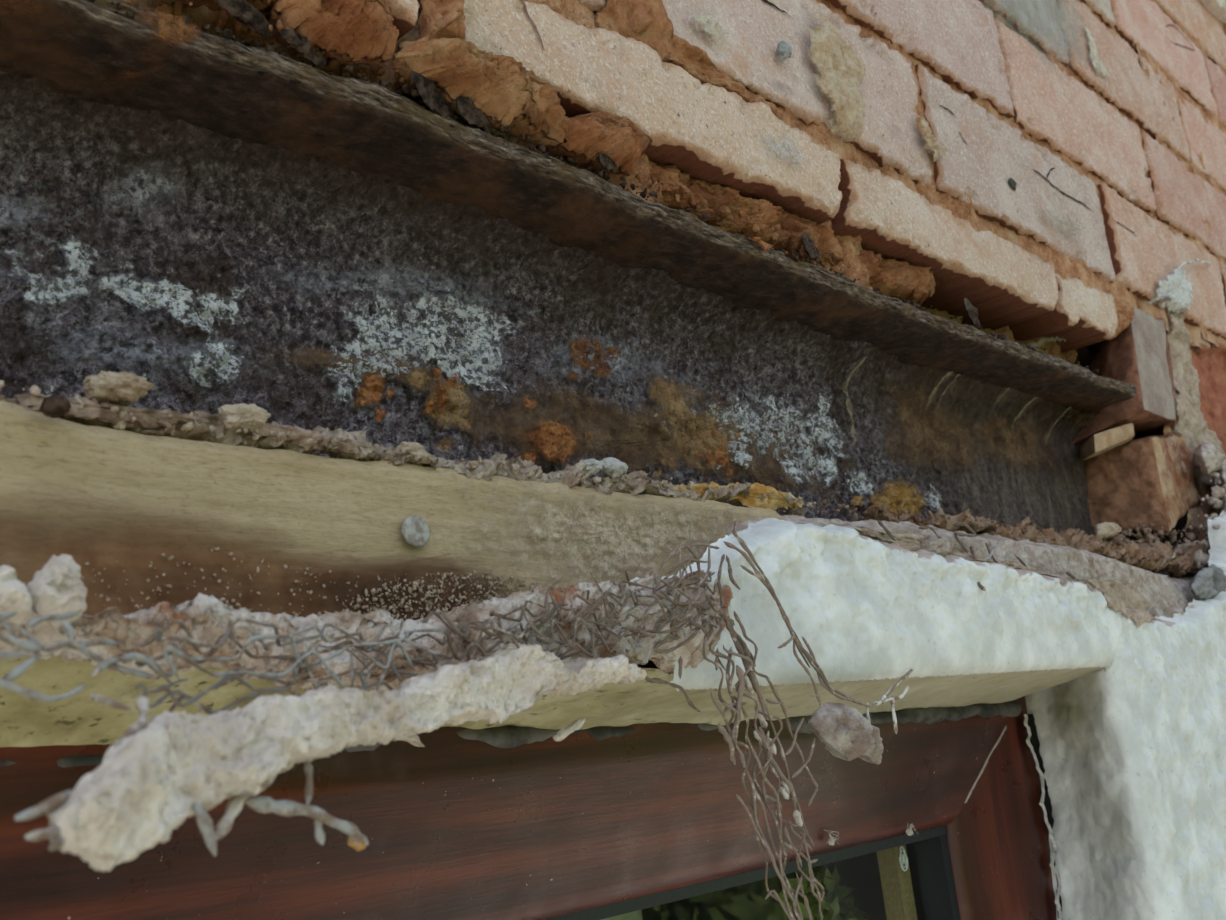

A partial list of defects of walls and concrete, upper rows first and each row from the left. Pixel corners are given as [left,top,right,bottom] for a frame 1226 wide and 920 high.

corrosion [142,11,199,43]
corrosion [214,0,327,68]
crack [763,0,790,16]
corrosion [410,70,491,134]
corrosion [747,237,773,249]
corrosion [963,298,981,330]
corrosion [291,337,817,510]
corrosion [851,481,926,517]
spalling [830,523,929,551]
spalling [947,544,1158,627]
spalling [0,570,733,692]
crack [1024,714,1062,920]